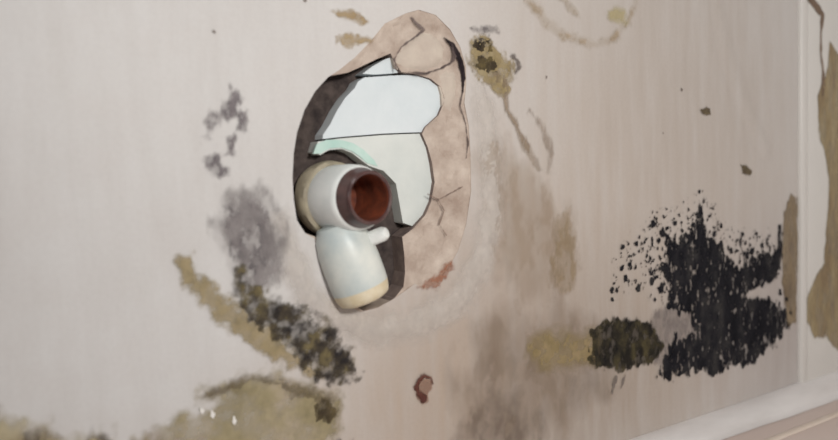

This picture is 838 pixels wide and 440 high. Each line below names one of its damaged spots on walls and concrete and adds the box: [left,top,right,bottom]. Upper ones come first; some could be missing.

damp [207,155,227,176]
damp [207,92,247,153]
spalling [308,10,471,301]
damp [470,27,530,153]
damp [807,0,838,349]
damp [167,192,360,440]
rust [414,374,434,403]
damp [528,190,798,393]